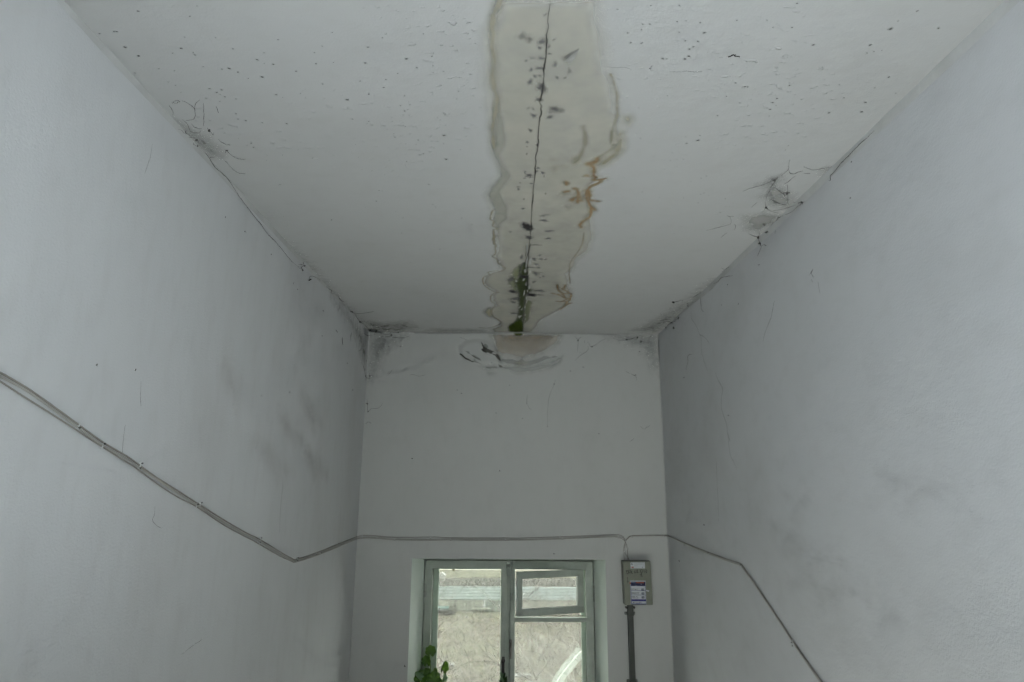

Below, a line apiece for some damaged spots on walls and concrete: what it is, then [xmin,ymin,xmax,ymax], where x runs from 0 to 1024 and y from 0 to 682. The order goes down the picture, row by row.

crack [205,153,301,269]
crack [515,7,550,320]
water stain [479,0,618,371]
rust [563,157,606,228]
peeling [460,342,505,369]